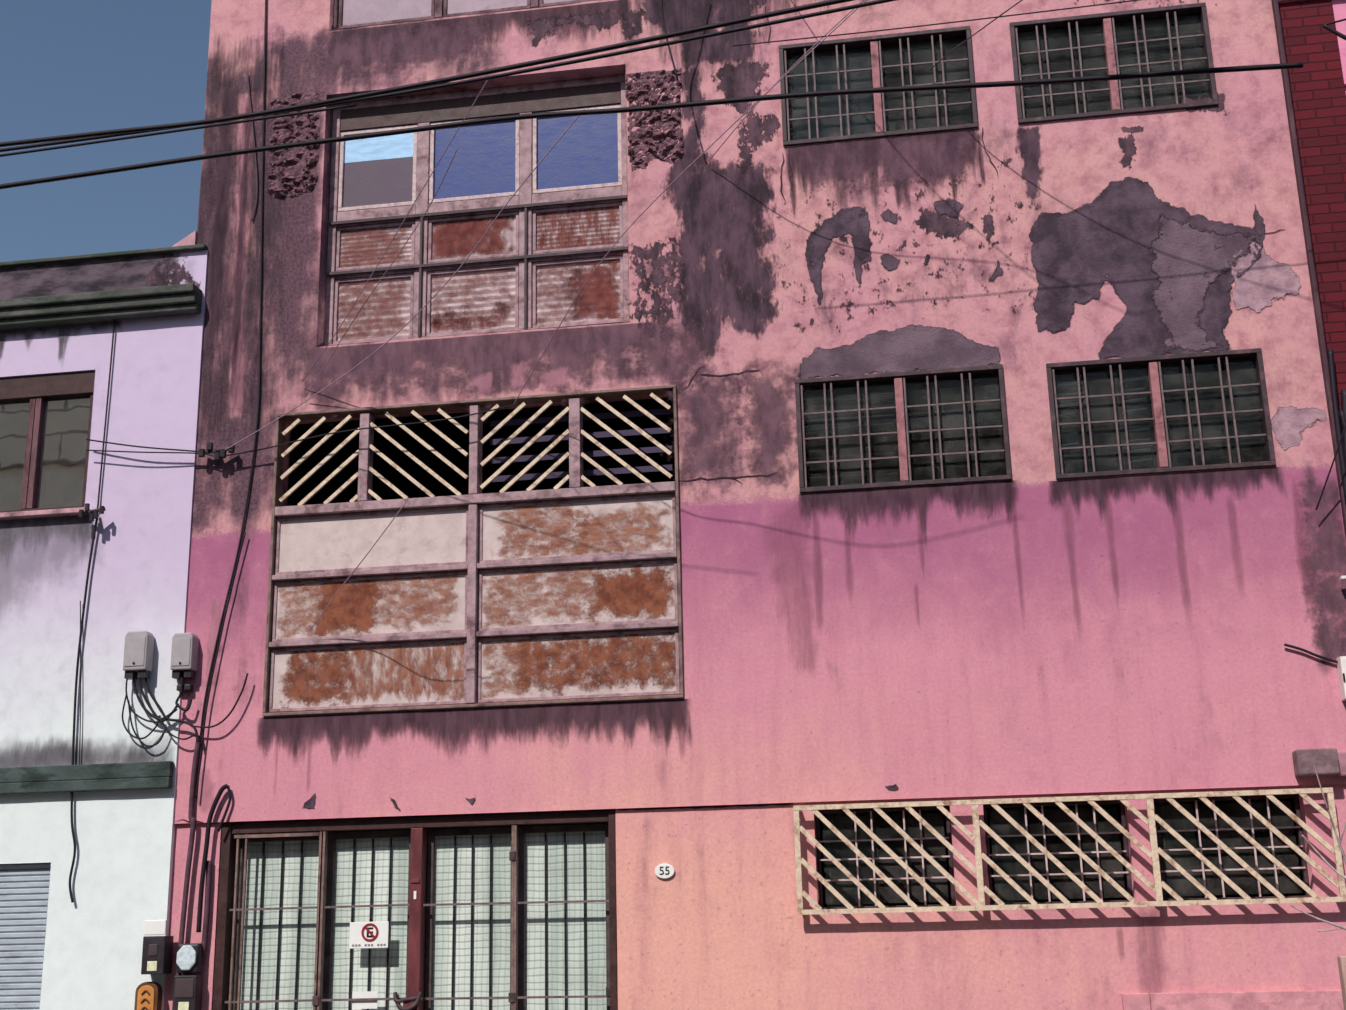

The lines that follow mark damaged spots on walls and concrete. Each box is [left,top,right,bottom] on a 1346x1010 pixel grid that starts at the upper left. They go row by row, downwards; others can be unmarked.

spalling [625,68,684,171]
damp [1118,126,1144,170]
rust [430,216,514,333]
rust [532,206,621,323]
damp [306,0,1041,484]
peeling [805,206,901,304]
peeling [1029,177,1301,360]
crack [682,366,759,390]
peeling [798,324,1001,379]
rust [278,572,464,708]
rust [481,502,680,699]
damp [259,699,690,755]